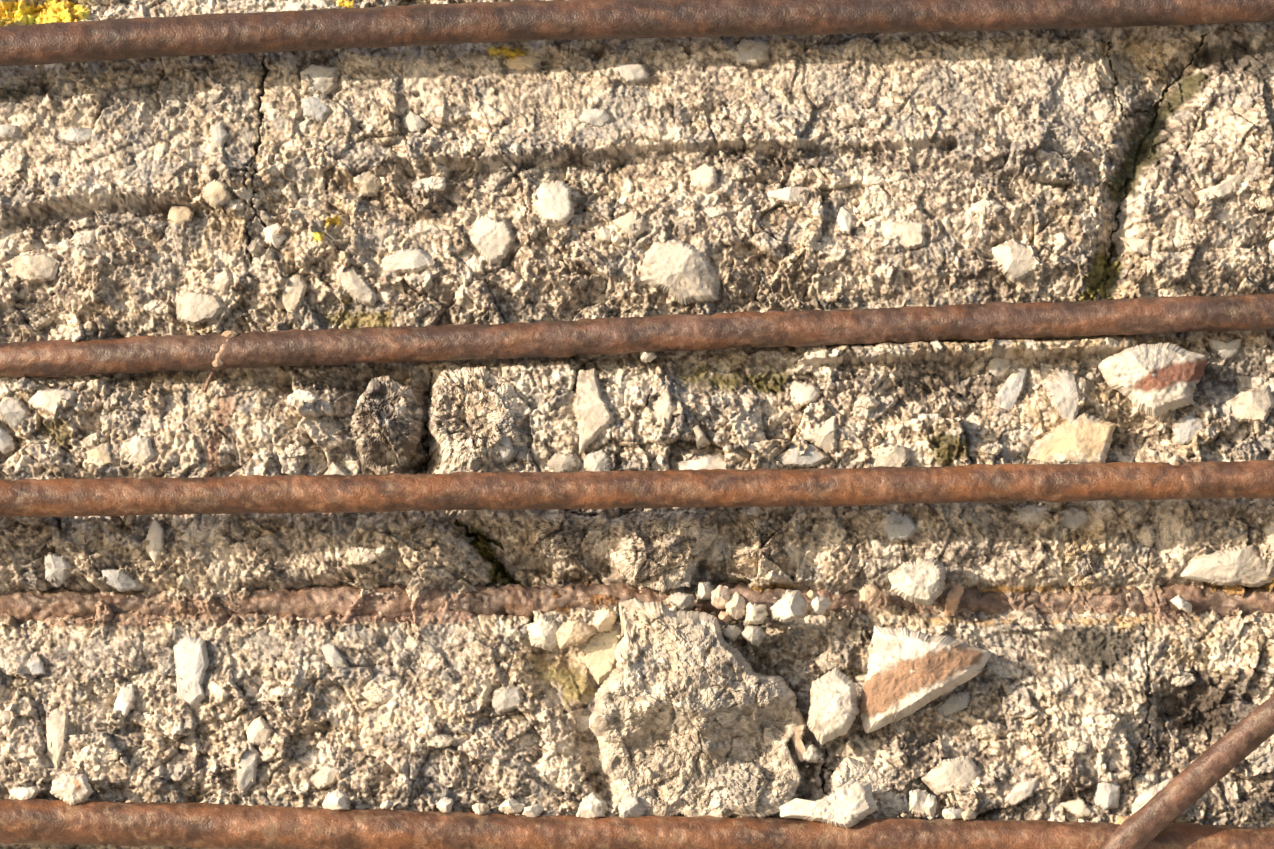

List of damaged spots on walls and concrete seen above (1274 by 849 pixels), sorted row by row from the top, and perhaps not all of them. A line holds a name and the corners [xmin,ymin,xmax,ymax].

crack [1106,34,1207,118]
spalling [0,206,246,340]
crack [243,56,269,263]
spalling [279,159,1079,322]
crack [1107,195,1127,264]
spalling [1152,100,1274,292]
corrosion [42,595,267,627]
corrosion [283,593,473,625]
corrosion [832,584,1198,629]
corrosion [1204,582,1245,615]
spalling [0,639,621,804]
spalling [887,682,1145,813]